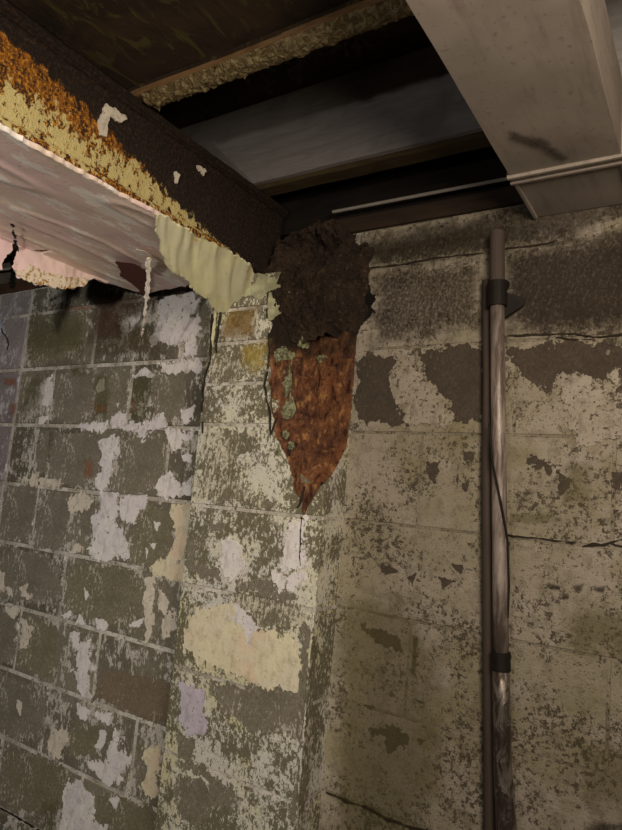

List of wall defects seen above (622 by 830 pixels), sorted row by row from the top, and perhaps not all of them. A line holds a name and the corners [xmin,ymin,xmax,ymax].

damp [369,204,622,339]
peeling [506,337,622,449]
peeling [0,123,483,830]
crack [326,792,427,830]